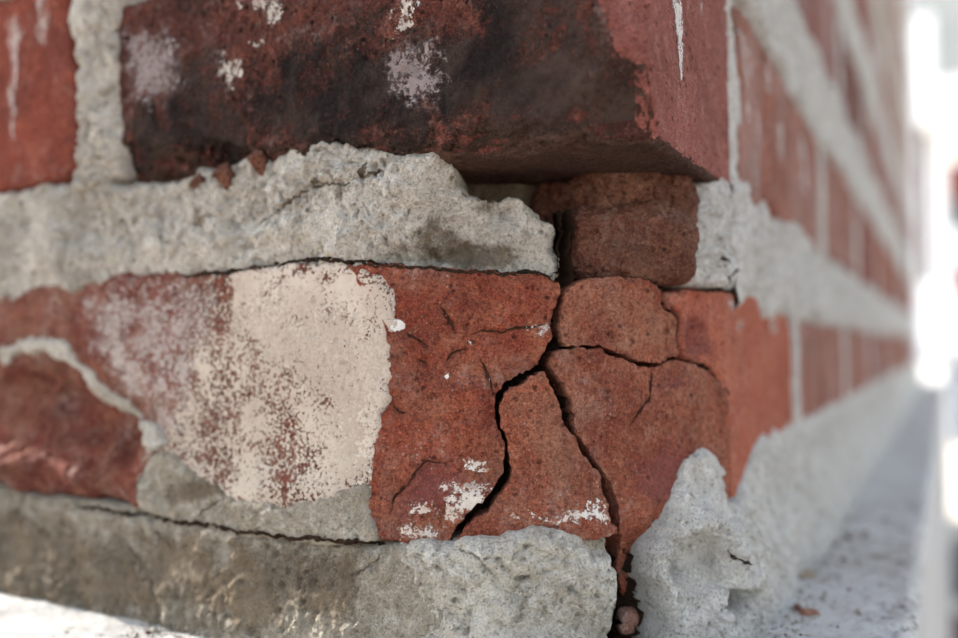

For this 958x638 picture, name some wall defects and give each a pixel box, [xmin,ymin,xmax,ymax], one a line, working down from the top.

crack [171,209,575,288]
crack [607,255,747,426]
spalling [141,261,731,595]
crack [406,306,583,531]
crack [70,452,385,546]
crack [390,460,441,512]
water stain [398,459,492,541]
water stain [510,499,610,525]
water stain [637,440,689,502]
crack [605,543,644,638]
crack [727,549,752,568]